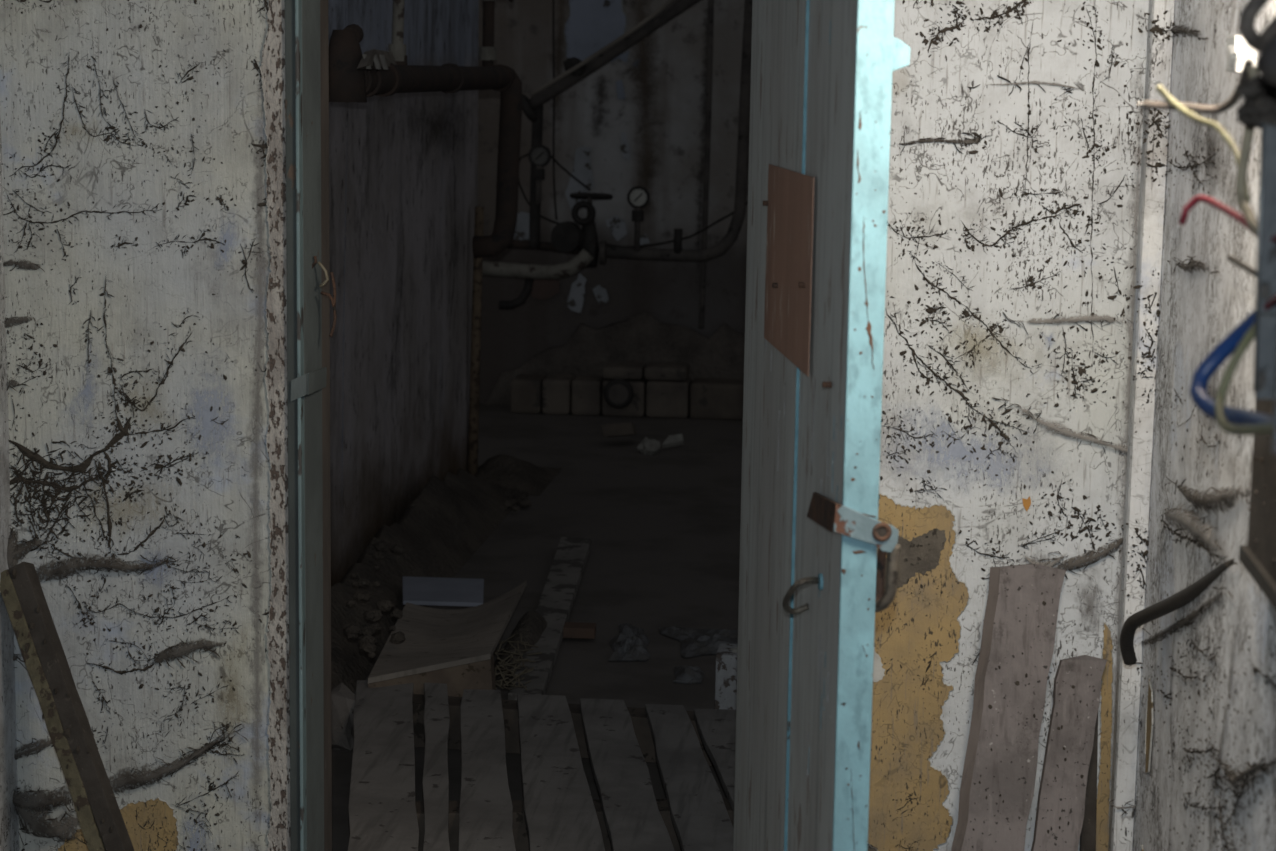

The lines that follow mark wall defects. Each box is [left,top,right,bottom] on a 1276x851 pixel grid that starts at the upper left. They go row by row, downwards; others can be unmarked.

peeling [854,210,886,370]
peeling [845,492,969,851]
peeling [119,797,180,851]